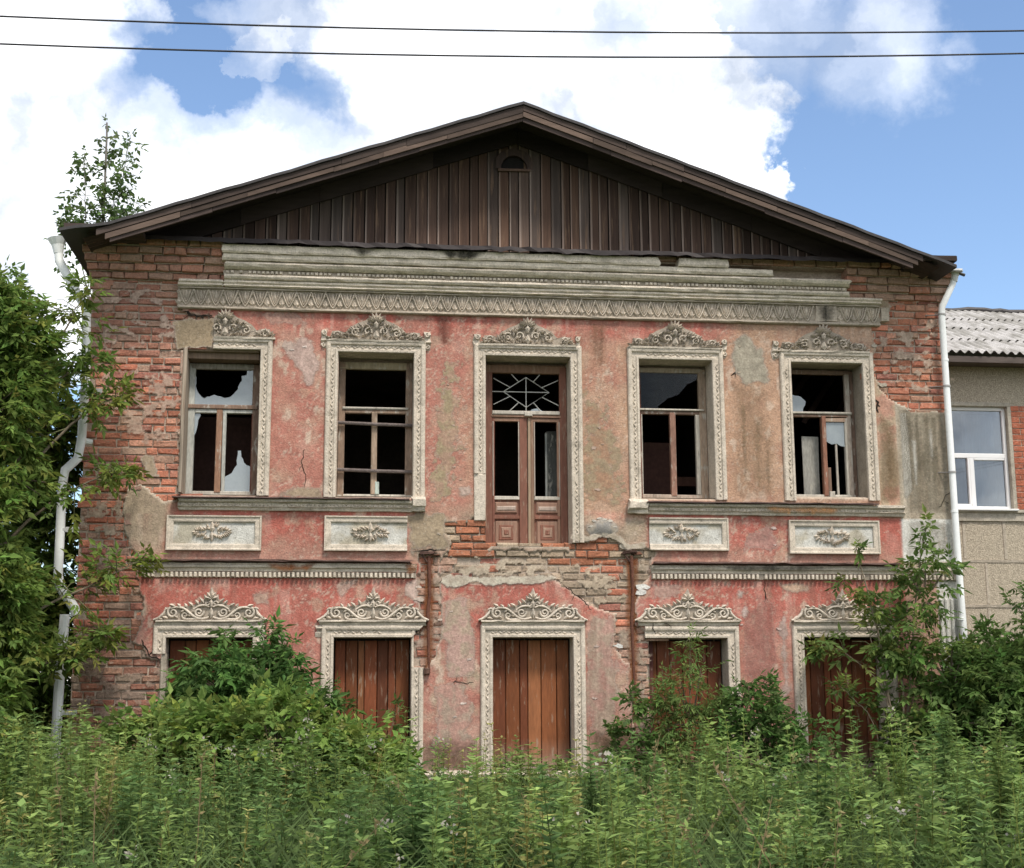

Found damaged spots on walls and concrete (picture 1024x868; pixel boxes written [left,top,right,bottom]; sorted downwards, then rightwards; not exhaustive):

peeling [731,335,770,385]
spalling [860,301,945,413]
water stain [884,412,944,509]
spalling [67,280,213,761]
spalling [405,360,679,774]
corrosion [627,561,637,627]